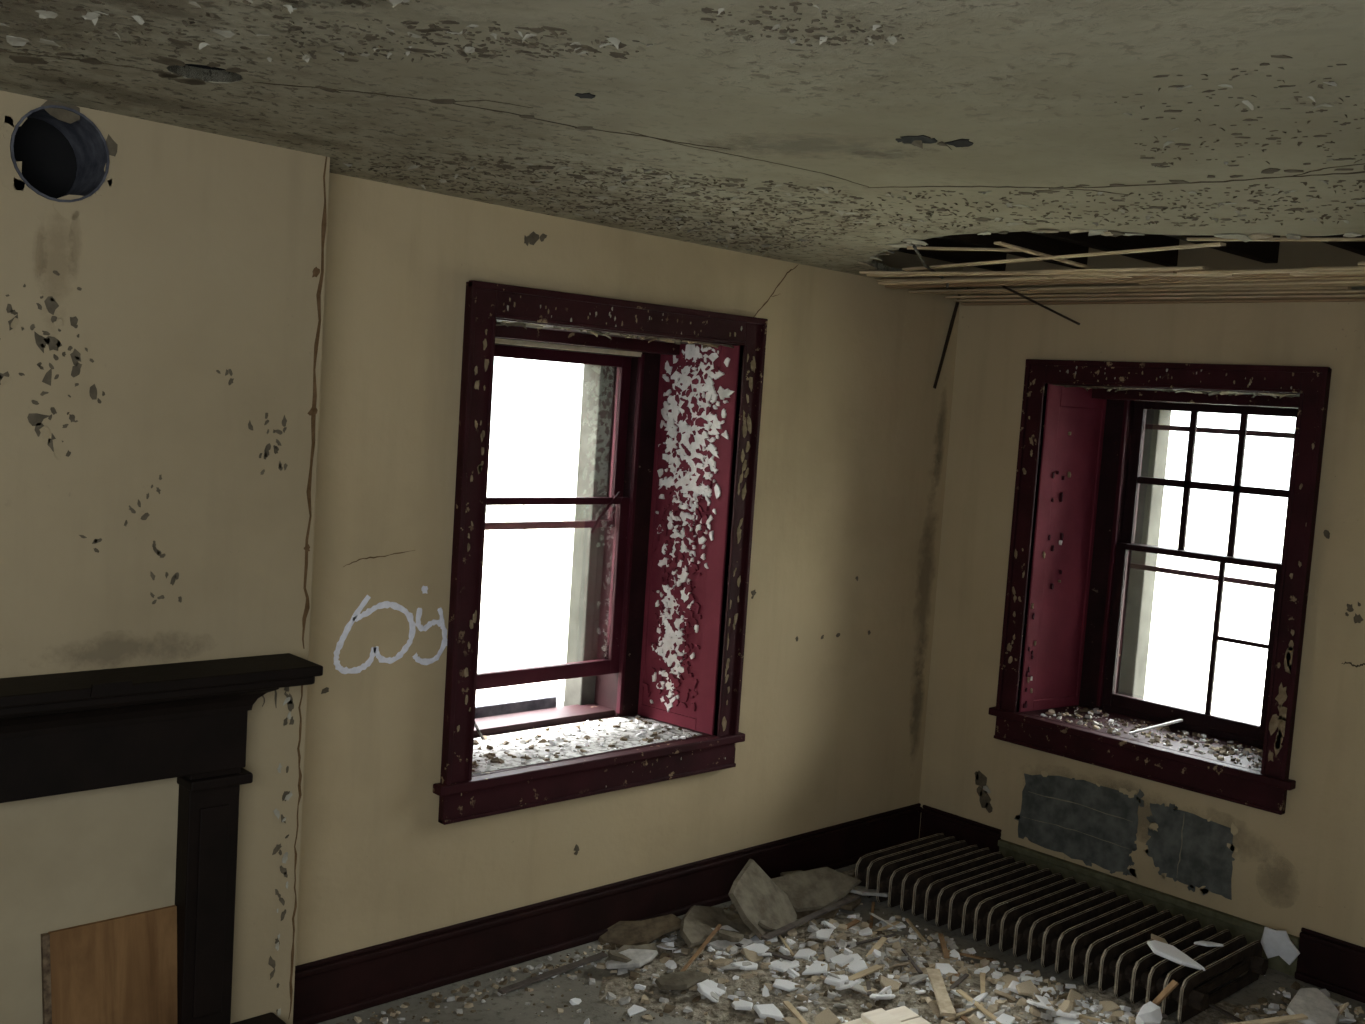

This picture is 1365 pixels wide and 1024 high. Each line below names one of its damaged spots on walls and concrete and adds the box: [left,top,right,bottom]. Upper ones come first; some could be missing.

peeling [0,294,105,460]
peeling [470,296,756,774]
peeling [1015,771,1238,900]